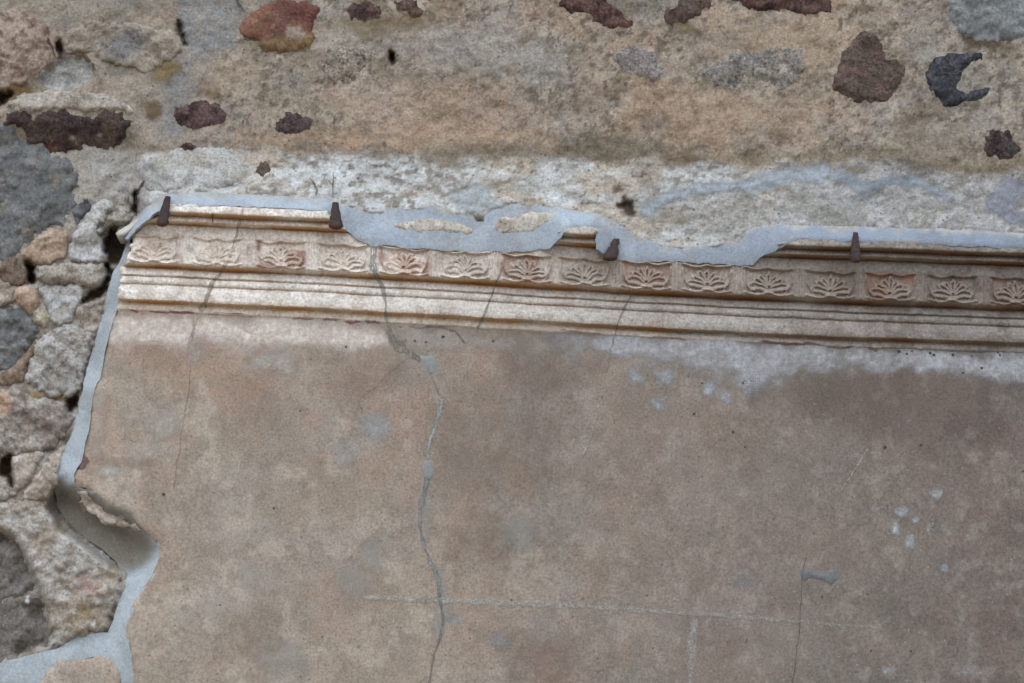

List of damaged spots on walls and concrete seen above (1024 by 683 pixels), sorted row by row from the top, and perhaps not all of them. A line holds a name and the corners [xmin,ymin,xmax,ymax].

damp [535,329,1024,403]
crack [355,249,503,683]
flaking render [77,491,140,532]